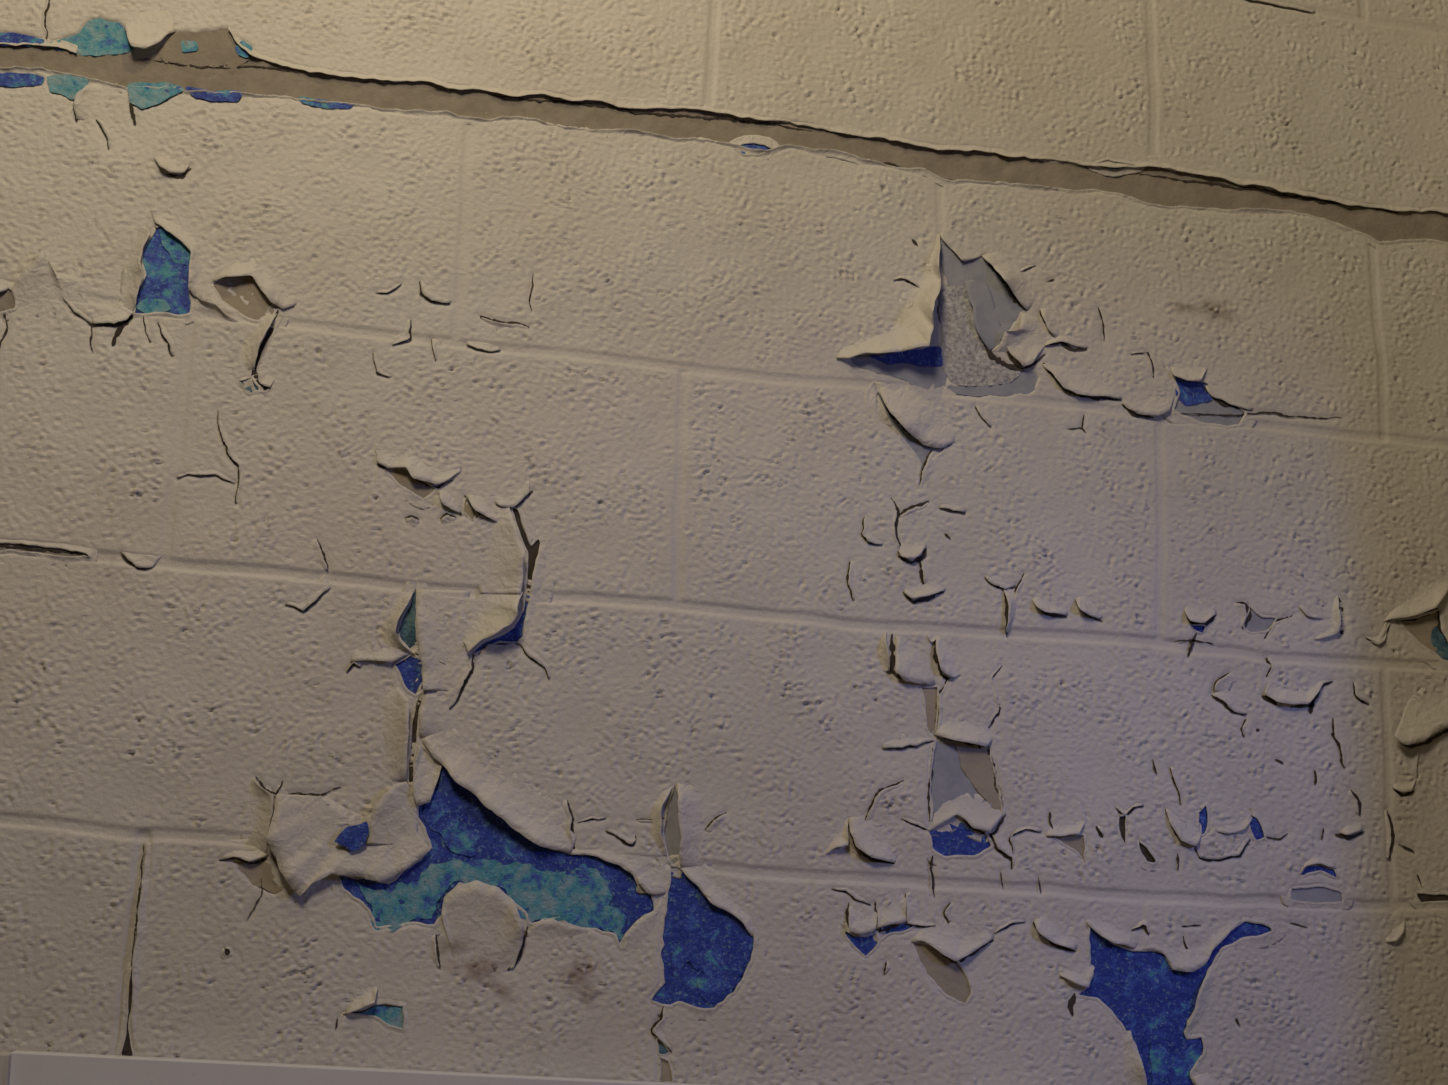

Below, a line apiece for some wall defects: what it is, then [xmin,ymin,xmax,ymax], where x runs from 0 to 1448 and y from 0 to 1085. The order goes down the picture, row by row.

crack [153,60,298,73]
crack [488,94,812,132]
peeling [0,10,1448,242]
crack [1139,174,1398,213]
crack [1248,0,1315,13]
peeling [0,208,297,398]
peeling [836,224,1341,436]
crack [115,842,159,1056]
peeling [219,446,768,1083]
peeling [825,630,1364,1085]
peeling [1174,601,1217,657]
peeling [1366,576,1448,797]